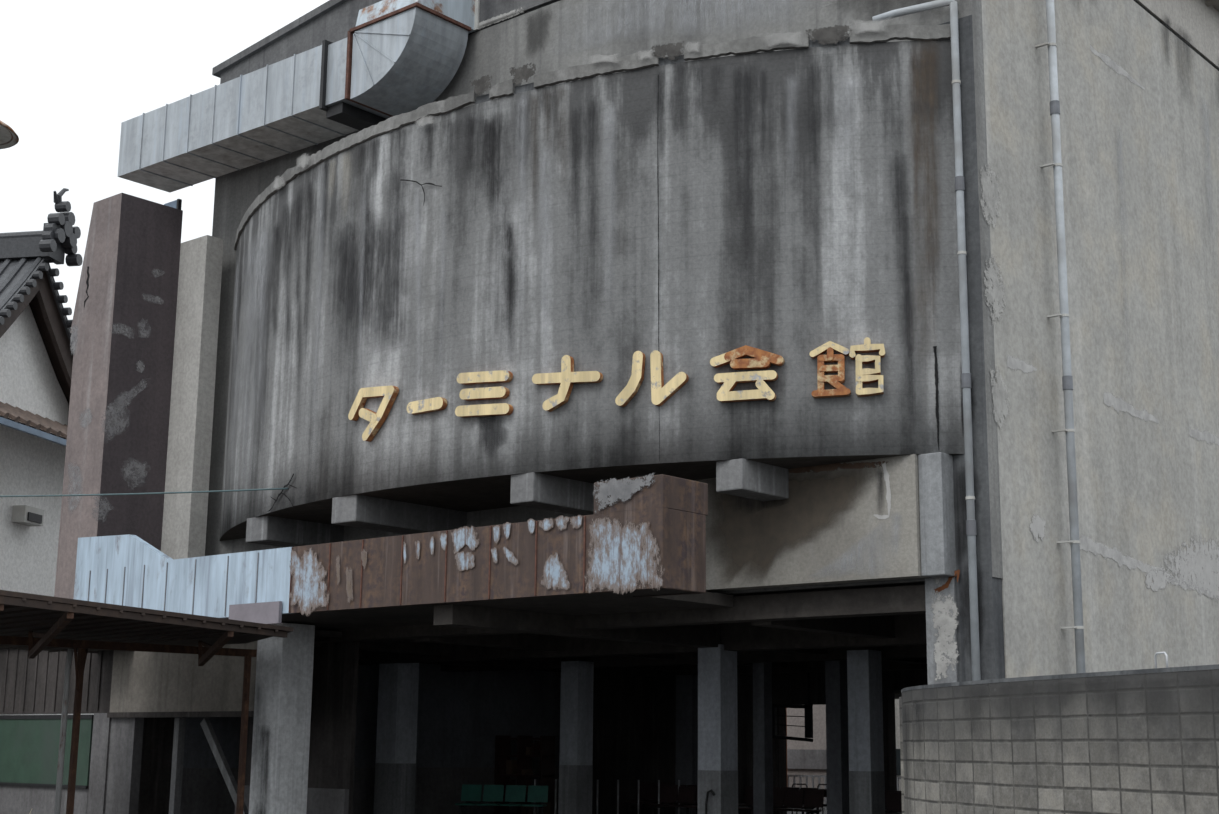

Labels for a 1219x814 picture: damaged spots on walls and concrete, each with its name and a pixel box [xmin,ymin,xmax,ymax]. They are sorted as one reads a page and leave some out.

spalling [769,20,886,46]
water stain [468,117,502,193]
crack [400,179,442,206]
crack [82,266,90,306]
crack [269,473,296,511]
peeling [403,522,518,571]
peeling [527,473,665,594]
water stain [957,475,975,552]
peeling [289,547,367,616]
peeling [931,577,959,681]
rust [934,569,960,593]
water stain [963,577,981,637]